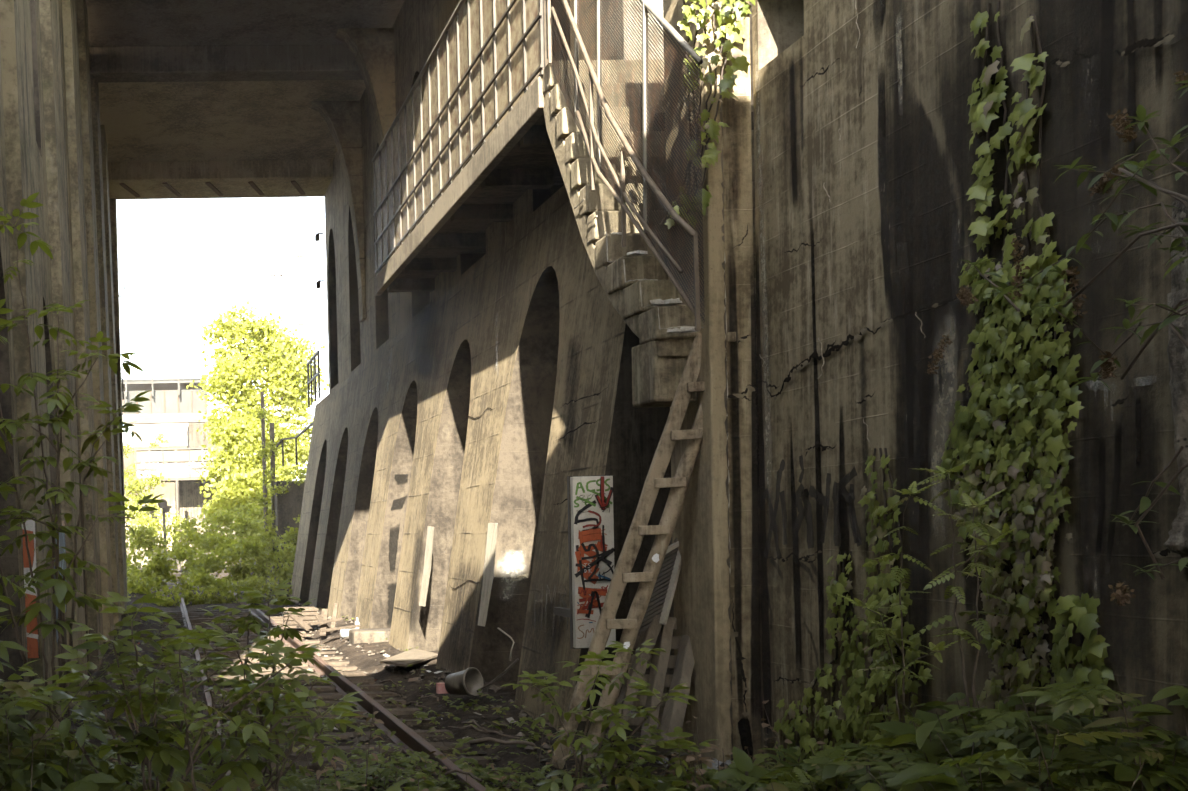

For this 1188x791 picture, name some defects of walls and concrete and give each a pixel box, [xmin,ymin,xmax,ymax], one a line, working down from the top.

damp [1038,0,1136,351]
damp [1154,0,1162,83]
crack [728,298,957,401]
damp [878,28,1012,689]
damp [1076,380,1158,671]